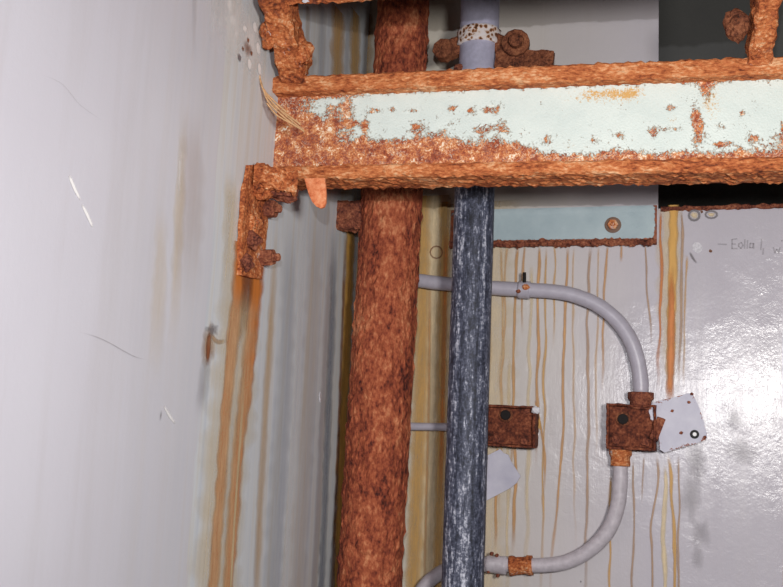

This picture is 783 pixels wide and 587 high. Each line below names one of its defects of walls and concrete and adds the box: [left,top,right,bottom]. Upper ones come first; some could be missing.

corrosion [334,7,342,75]
corrosion [352,9,368,74]
corrosion [419,195,453,277]
corrosion [491,205,687,406]
corrosion [204,241,263,587]
corrosion [332,231,359,587]
corrosion [409,288,450,587]
corrosion [528,298,567,517]
corrosion [506,483,517,539]
corrosion [631,465,644,587]
corrosion [650,463,680,587]